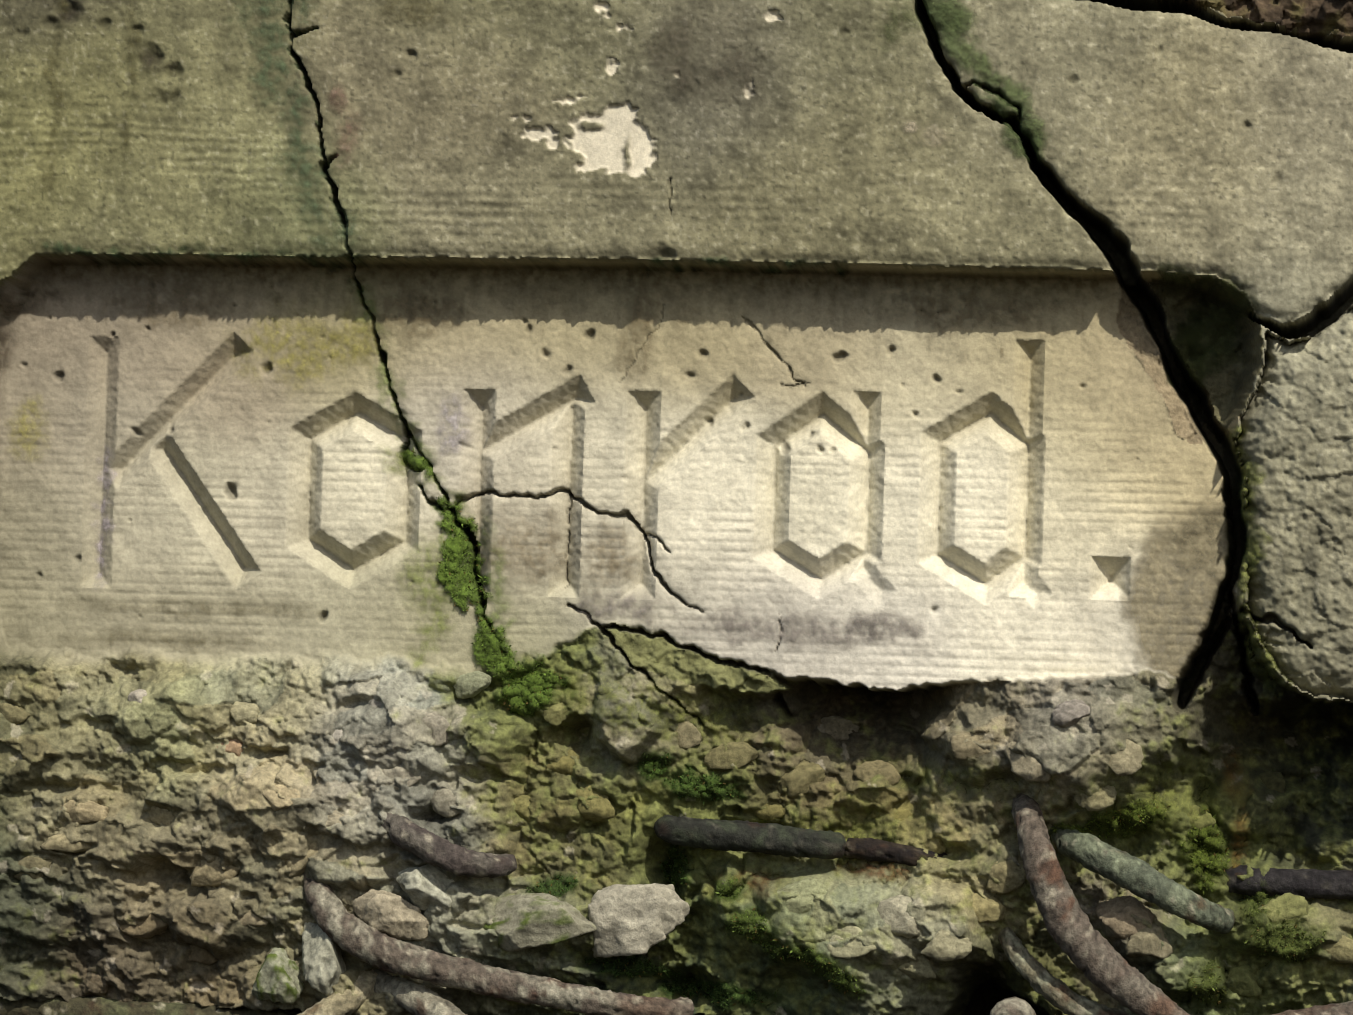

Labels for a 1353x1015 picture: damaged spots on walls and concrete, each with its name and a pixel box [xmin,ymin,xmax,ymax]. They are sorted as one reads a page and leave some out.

peeling [594,2,634,33]
peeling [762,11,784,24]
peeling [605,58,620,77]
peeling [743,80,757,102]
peeling [510,95,660,179]
crack [285,0,784,729]
crack [742,316,812,389]
crack [914,0,1353,716]
spalling [0,611,1353,1015]